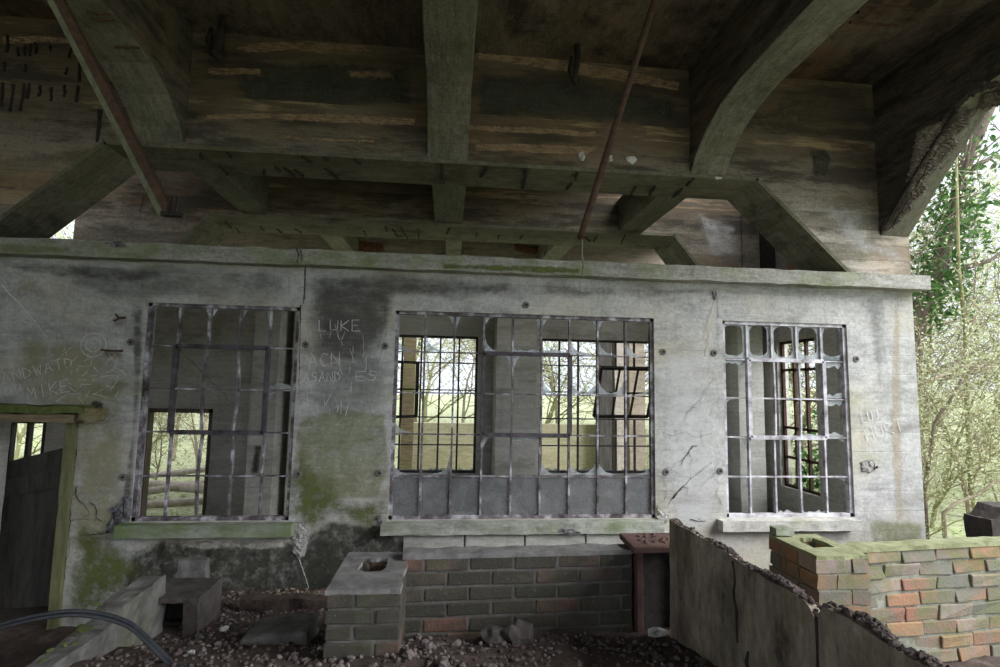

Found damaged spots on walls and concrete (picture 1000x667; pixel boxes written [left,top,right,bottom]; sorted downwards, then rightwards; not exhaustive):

spalling [881,80,1000,235]
damp [320,280,448,355]
crack [663,379,722,504]
crack [64,449,124,580]